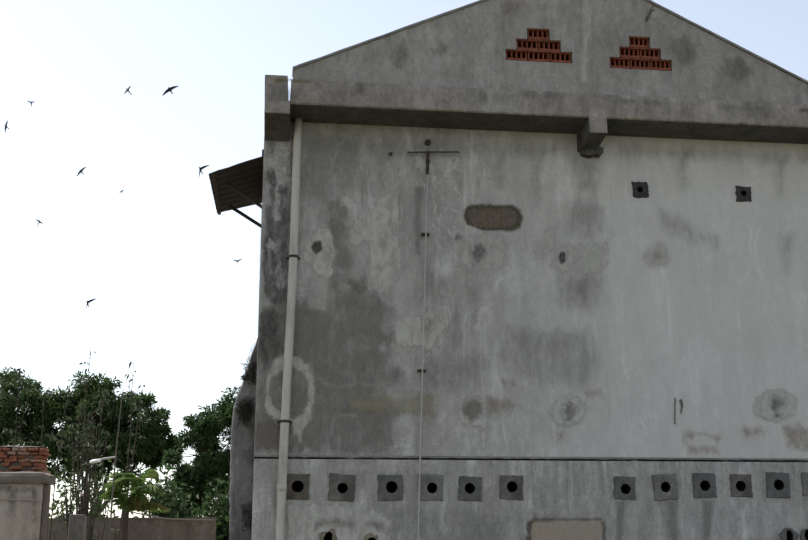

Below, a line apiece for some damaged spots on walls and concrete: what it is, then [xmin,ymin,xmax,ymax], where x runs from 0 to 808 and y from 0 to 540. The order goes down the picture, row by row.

water stain [237,172,395,454]
peeling [286,466,392,540]